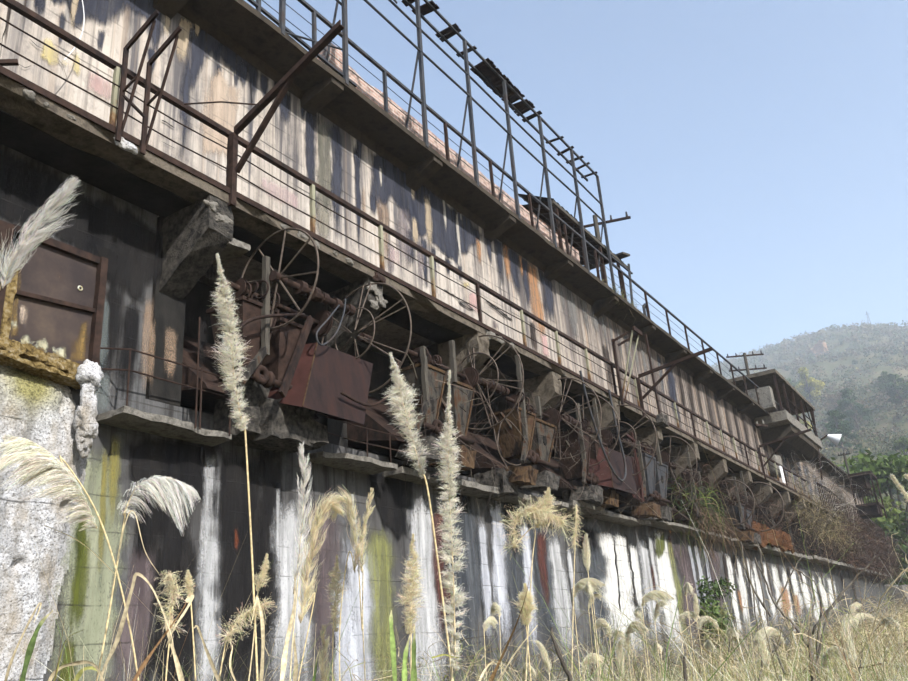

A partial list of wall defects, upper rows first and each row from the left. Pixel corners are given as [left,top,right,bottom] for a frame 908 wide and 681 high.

water stain [23,0,277,152]
water stain [279,93,342,231]
water stain [0,150,163,407]
corrosion [504,244,545,331]
water stain [353,140,826,501]
water stain [53,438,858,681]
crack [613,532,637,612]